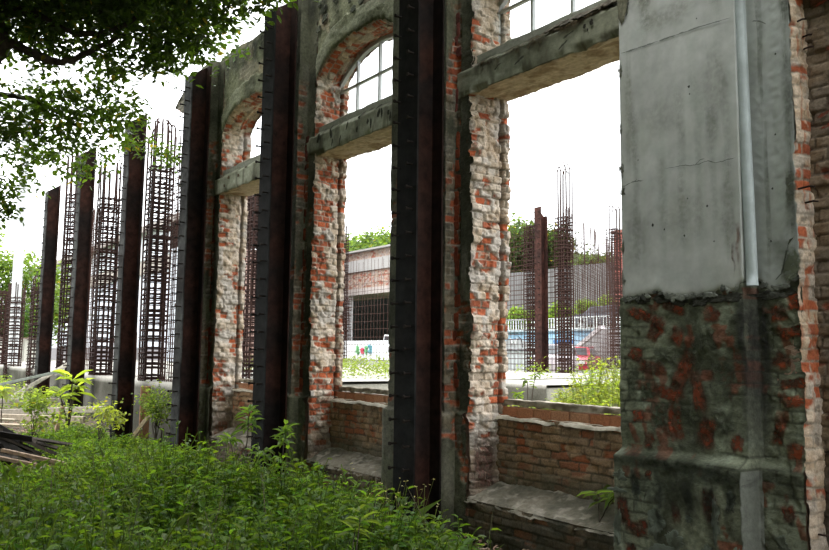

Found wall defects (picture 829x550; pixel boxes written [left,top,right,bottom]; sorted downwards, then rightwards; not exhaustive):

crack [623,18,728,53]
spalling [305,104,391,170]
flaking render [785,169,796,201]
flaking render [622,238,802,452]
flaking render [780,377,806,408]
flaking render [772,417,804,460]
spalling [617,496,647,550]